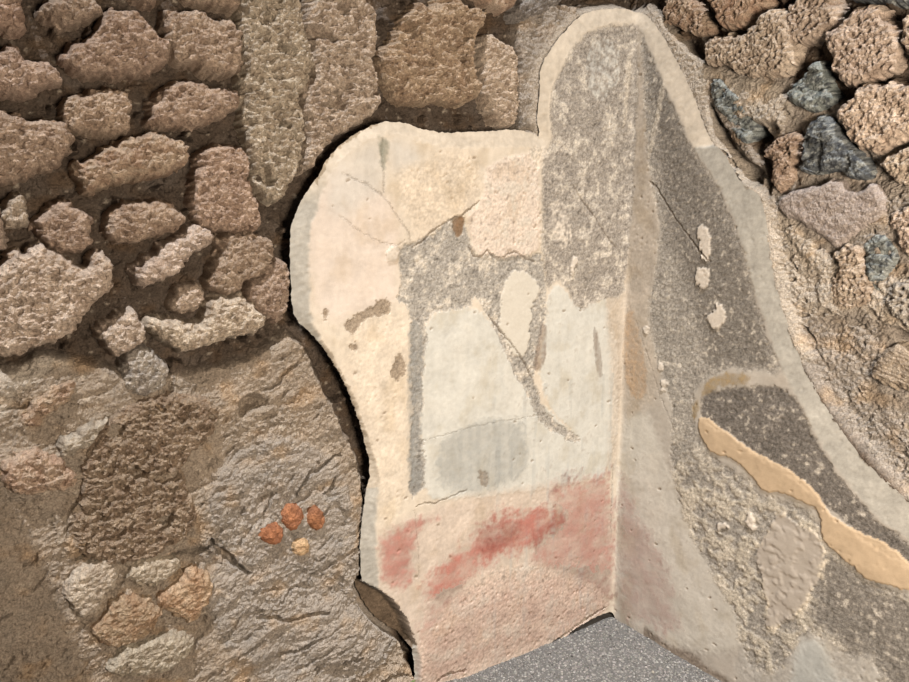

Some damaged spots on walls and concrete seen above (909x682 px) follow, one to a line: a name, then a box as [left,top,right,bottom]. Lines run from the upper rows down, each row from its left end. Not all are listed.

crack [339,137,480,248]
crack [468,245,535,263]
crack [487,314,534,379]
spalling [343,22,909,682]